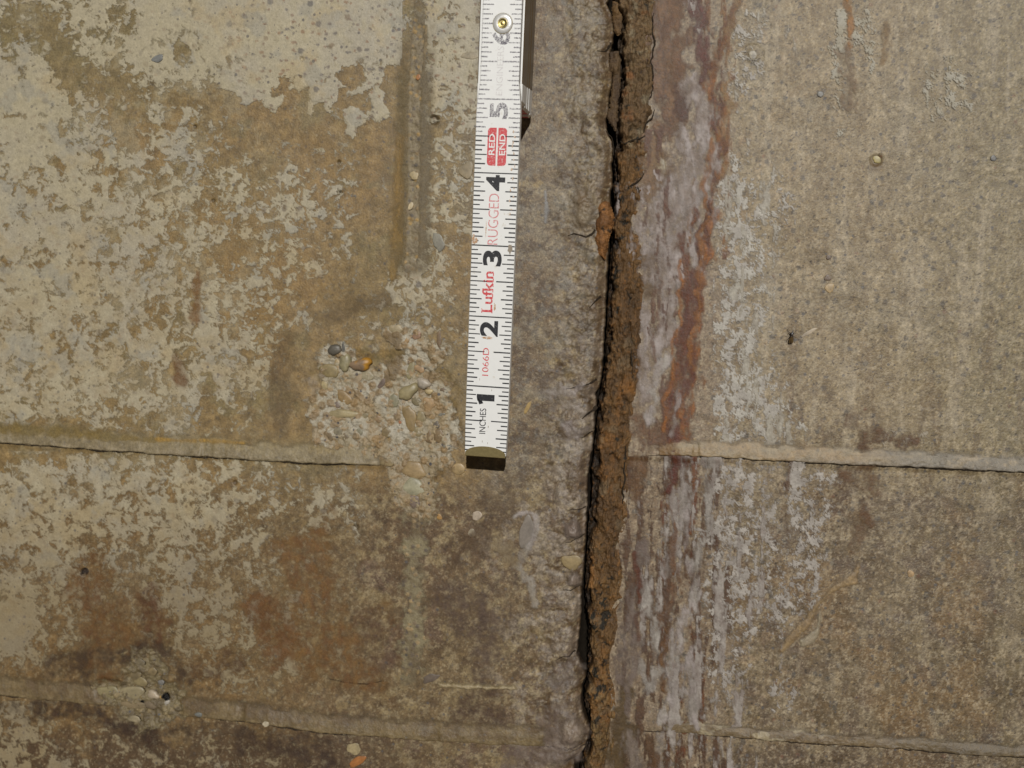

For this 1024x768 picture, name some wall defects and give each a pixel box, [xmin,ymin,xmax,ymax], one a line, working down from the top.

crack [598,0,621,52]
rust [657,0,741,692]
peeling [0,0,482,768]
crack [539,13,656,768]
damp [603,0,839,768]
crack [0,443,371,466]
crack [622,445,664,504]
crack [697,457,1024,473]
rust [646,733,689,768]